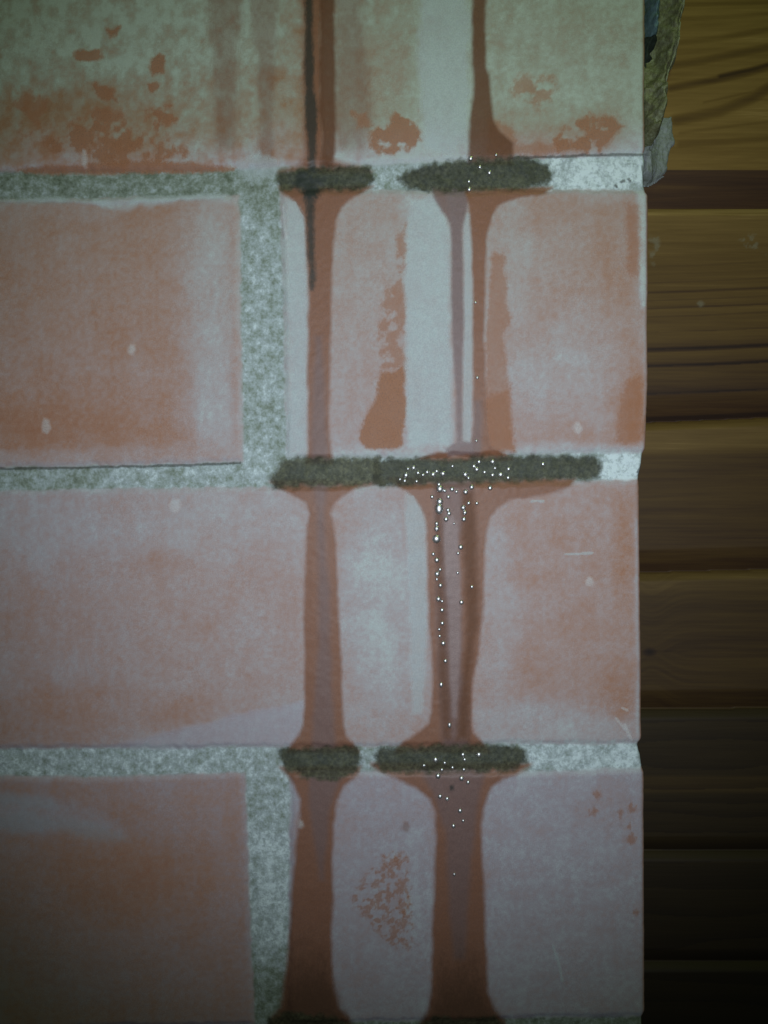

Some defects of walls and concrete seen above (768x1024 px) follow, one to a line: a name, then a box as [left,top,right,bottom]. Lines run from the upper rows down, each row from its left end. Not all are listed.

water stain [121,0,603,1024]